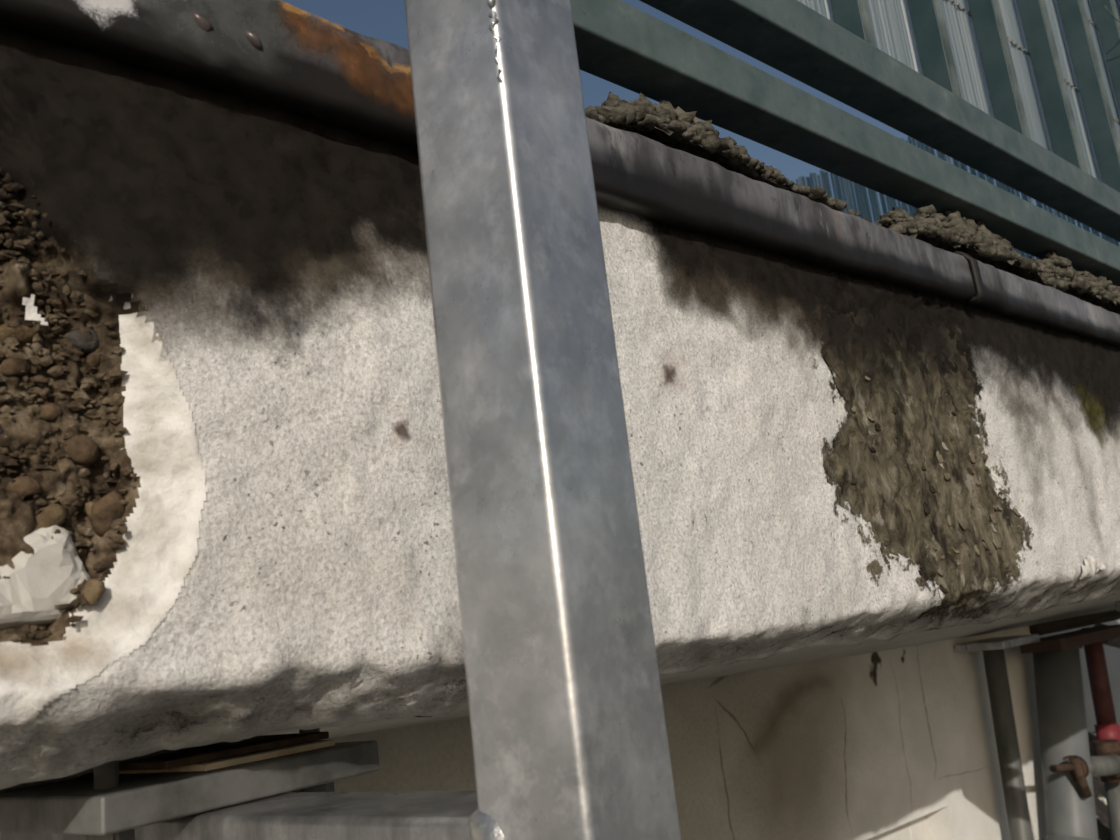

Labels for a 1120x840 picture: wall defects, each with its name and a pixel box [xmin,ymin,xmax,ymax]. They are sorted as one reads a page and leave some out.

spalling [0,167,209,726]
damp [0,25,428,332]
corrosion [282,1,415,112]
damp [652,220,1120,443]
peeling [807,292,1035,631]